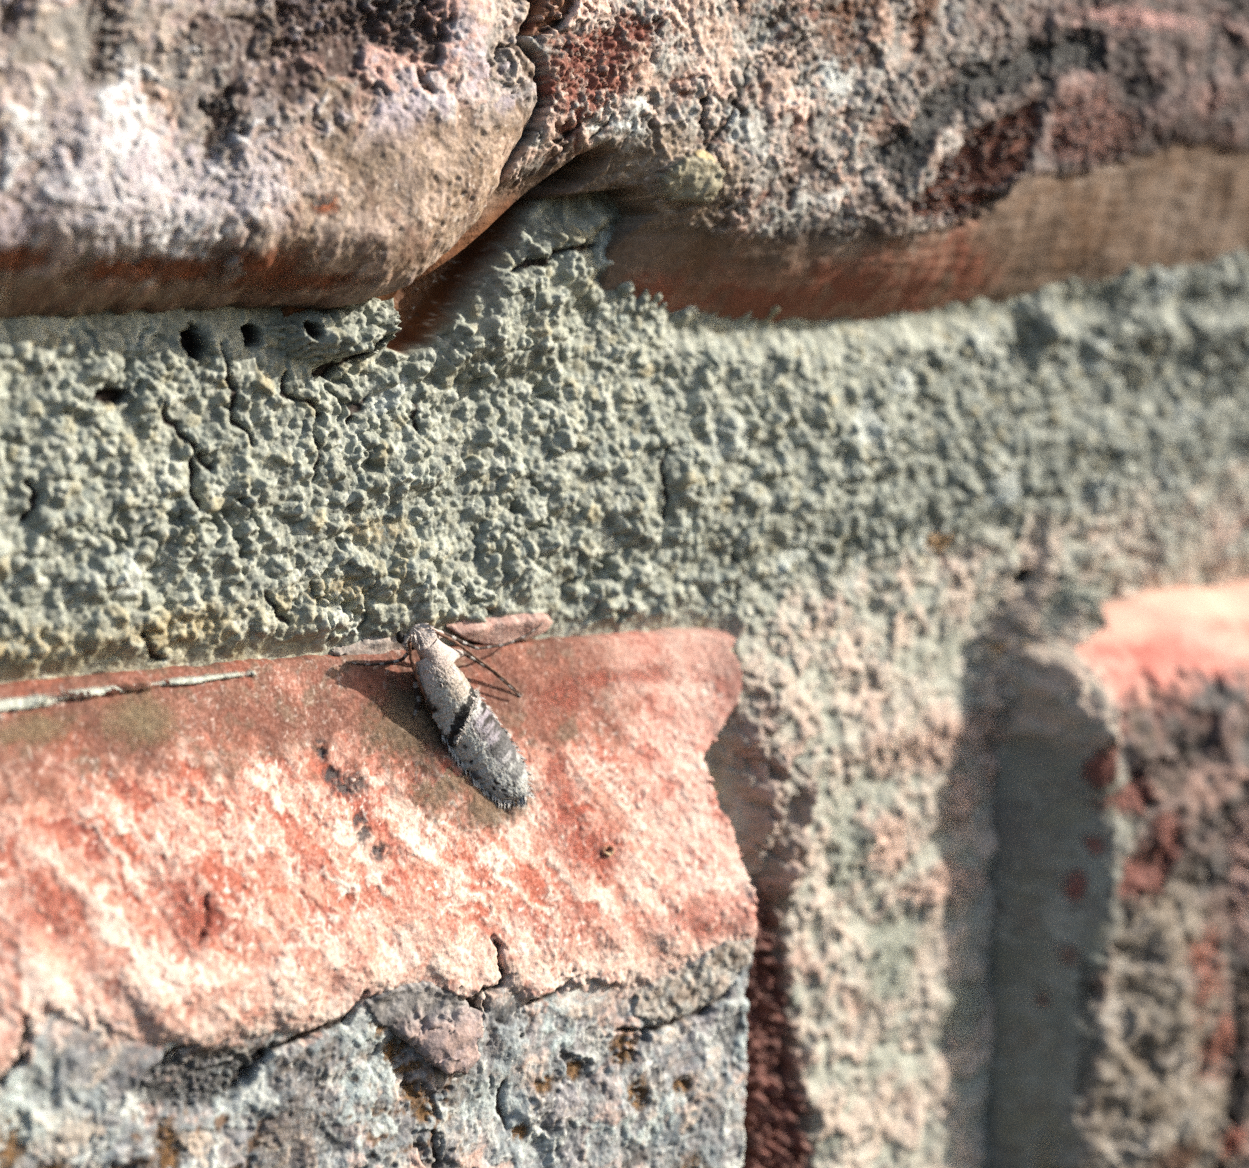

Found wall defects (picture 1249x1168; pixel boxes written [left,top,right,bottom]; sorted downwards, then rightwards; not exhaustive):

peeling [632,939,755,1023]
peeling [364,980,484,1075]
spalling [139,1047,257,1107]